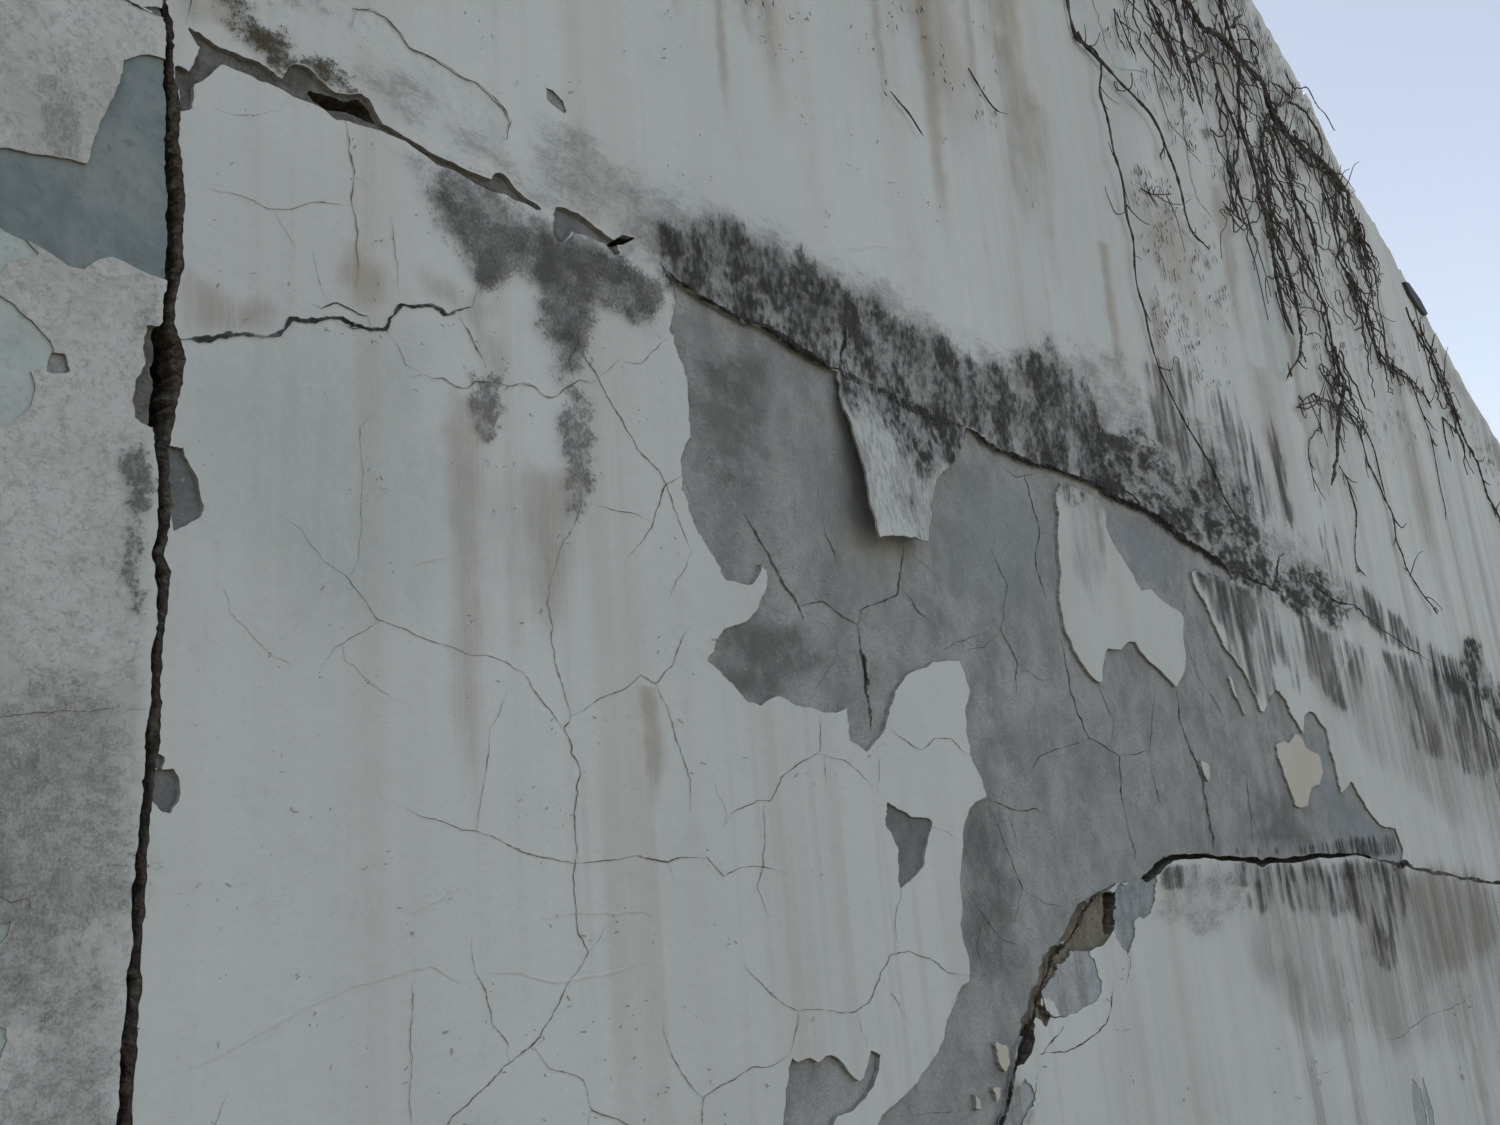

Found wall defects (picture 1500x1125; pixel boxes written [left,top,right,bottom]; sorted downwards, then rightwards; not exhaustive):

peeling [0,28,634,279]
flaking render [47,352,70,374]
leakage [119,445,159,613]
flaking render [132,325,157,426]
crack [101,0,880,1125]
leakage [437,172,1500,785]
crack [968,429,1431,662]
crack [3,692,105,717]
flaking render [666,273,1403,1125]
crack [665,512,1500,1125]
leakage [1163,857,1197,889]
leakage [1240,791,1409,968]